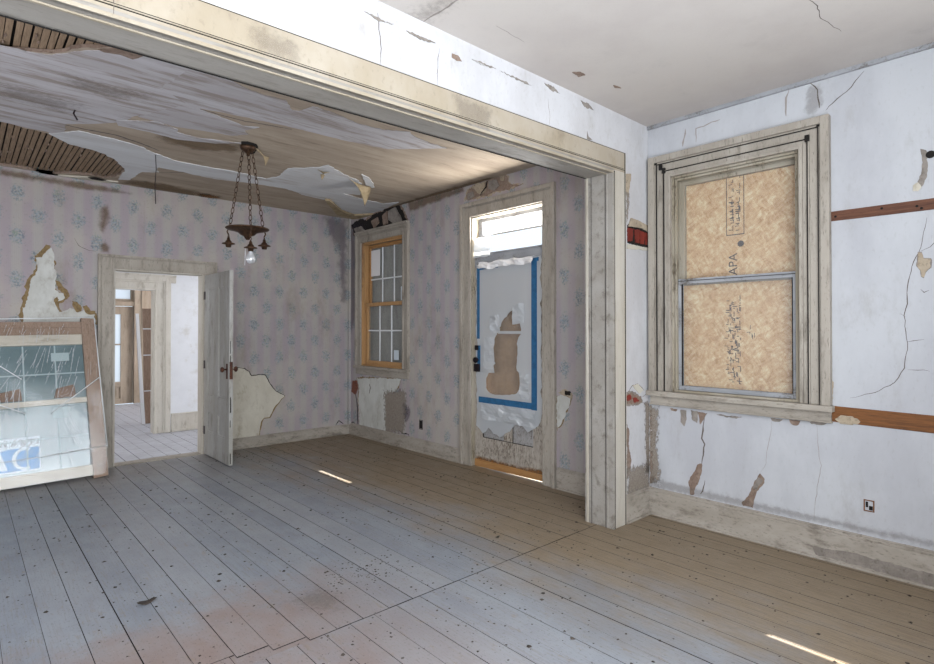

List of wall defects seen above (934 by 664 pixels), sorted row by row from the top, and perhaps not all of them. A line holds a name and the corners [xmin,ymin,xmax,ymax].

peeling [452,53,529,85]
peeling [0,16,445,236]
spalling [913,149,934,191]
crack [853,219,934,398]
peeling [670,408,740,426]
peeling [771,418,827,426]
peeling [688,464,702,495]
peeling [742,474,765,508]